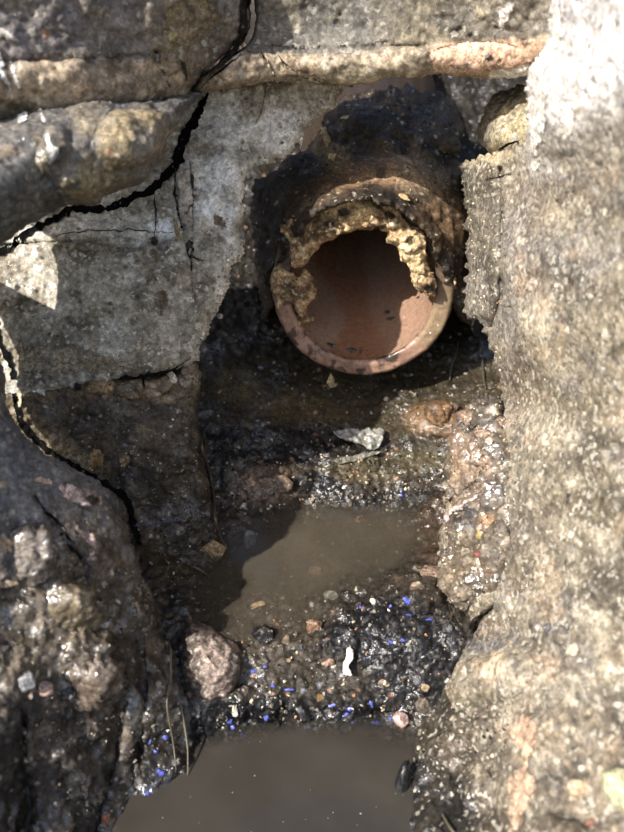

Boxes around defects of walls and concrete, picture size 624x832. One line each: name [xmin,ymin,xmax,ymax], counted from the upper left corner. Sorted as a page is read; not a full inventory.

crack [0,0,320,270]
crack [112,357,191,390]
crack [0,335,142,545]
water stain [17,707,37,832]
water stain [109,688,128,784]